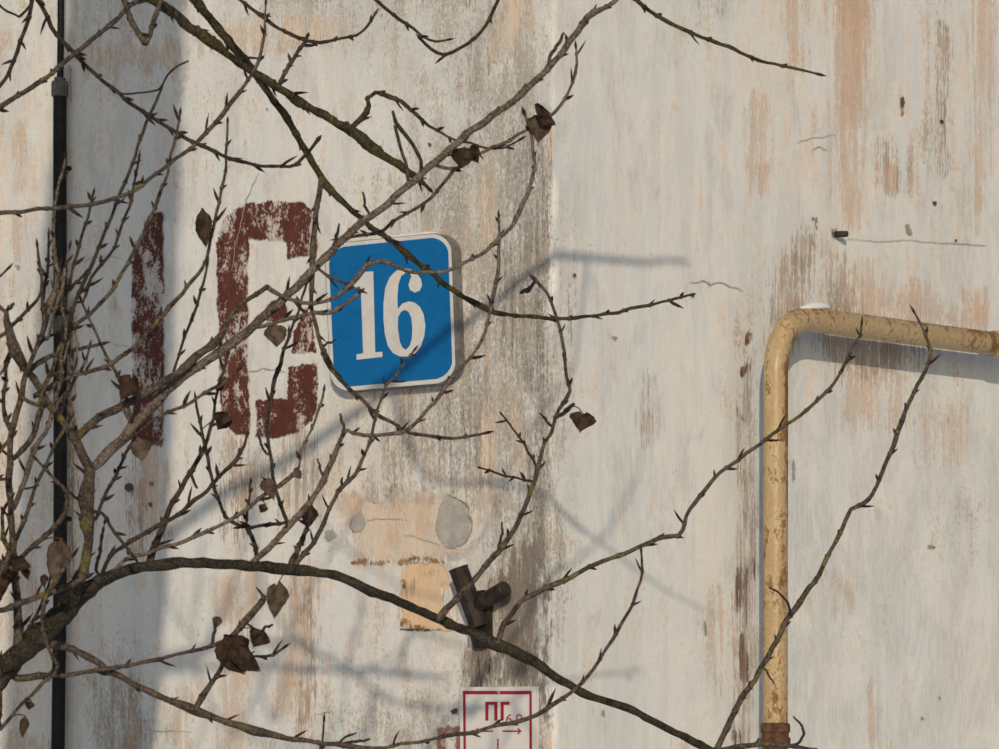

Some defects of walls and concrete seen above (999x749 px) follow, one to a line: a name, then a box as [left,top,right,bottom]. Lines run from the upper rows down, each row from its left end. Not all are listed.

peeling [488,0,534,71]
peeling [463,151,496,255]
peeling [876,136,901,197]
peeling [764,217,988,343]
peeling [815,334,925,388]
peeling [338,382,527,637]
corrosion [735,555,755,687]